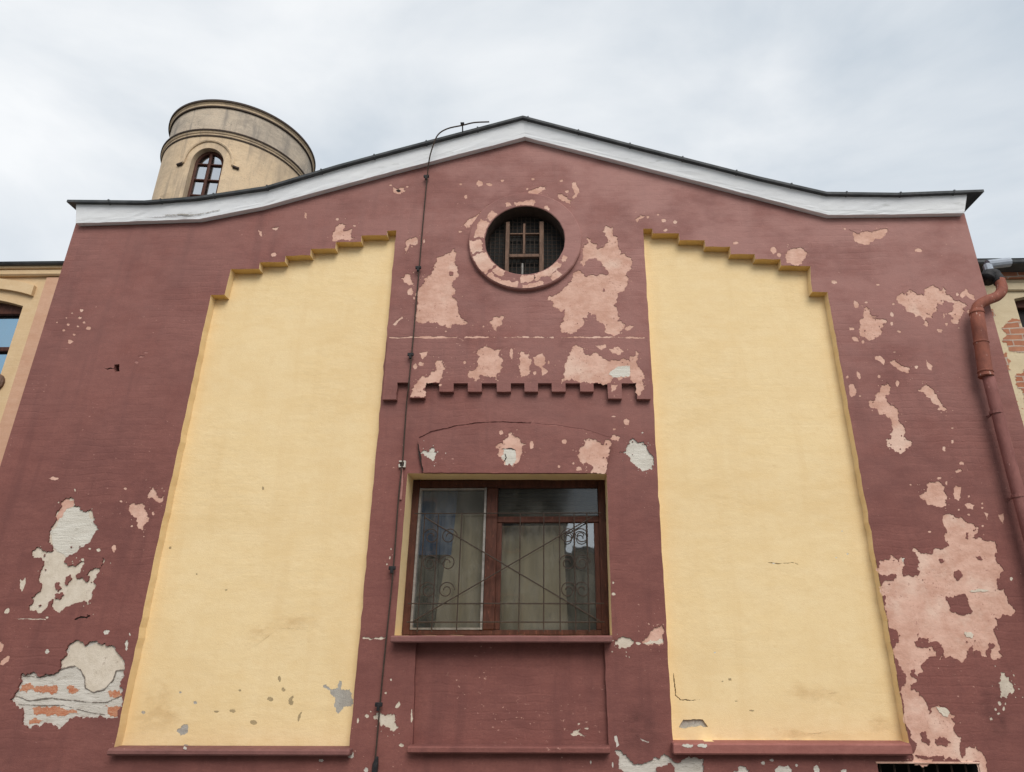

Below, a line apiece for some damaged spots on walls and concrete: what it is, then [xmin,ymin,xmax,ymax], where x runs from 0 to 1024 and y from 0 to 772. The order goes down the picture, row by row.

peeling [389,178,645,397]
peeling [849,285,975,343]
peeling [496,429,534,467]
peeling [557,416,654,474]
peeling [846,351,953,454]
flaking render [4,489,116,620]
peeling [120,479,164,537]
peeling [876,461,1023,772]
flaking render [12,630,131,729]